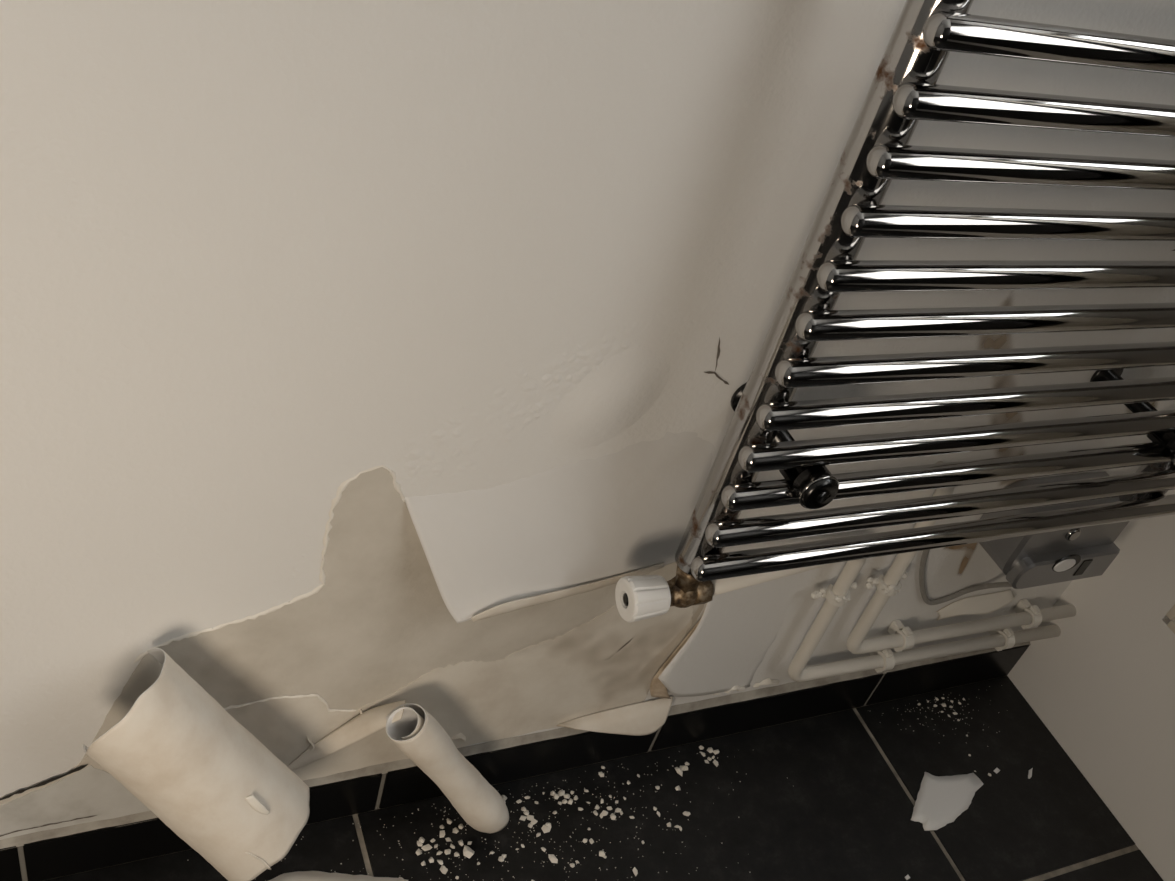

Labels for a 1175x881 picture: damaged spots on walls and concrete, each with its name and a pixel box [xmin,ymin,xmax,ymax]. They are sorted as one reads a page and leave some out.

peeling [0,432,789,881]
crack [0,765,87,800]
crack [0,815,97,837]